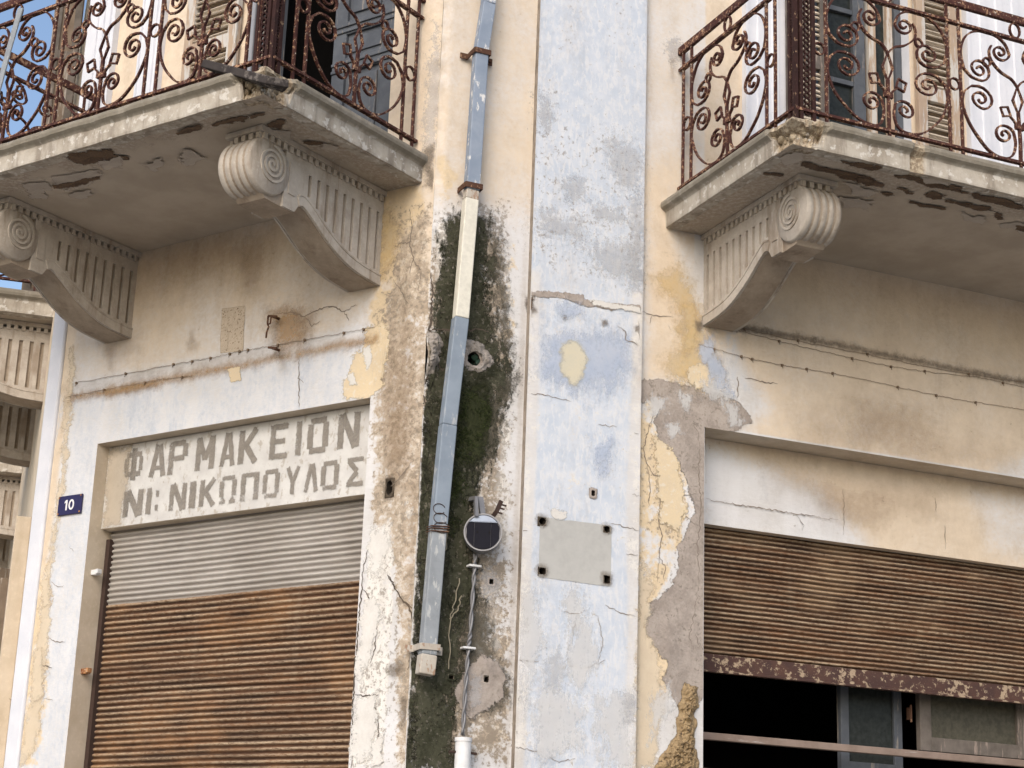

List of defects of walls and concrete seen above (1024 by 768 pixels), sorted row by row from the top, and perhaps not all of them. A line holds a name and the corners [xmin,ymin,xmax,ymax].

flaking render [22,149,129,199]
spalling [763,131,1024,234]
crack [278,305,355,327]
flaking render [342,320,390,400]
flaking render [464,339,495,373]
crack [531,290,671,344]
crack [351,550,412,737]
damp [390,366,437,757]
damp [443,219,521,712]
crack [598,414,666,581]
flaking render [641,371,752,768]
crack [687,426,845,649]